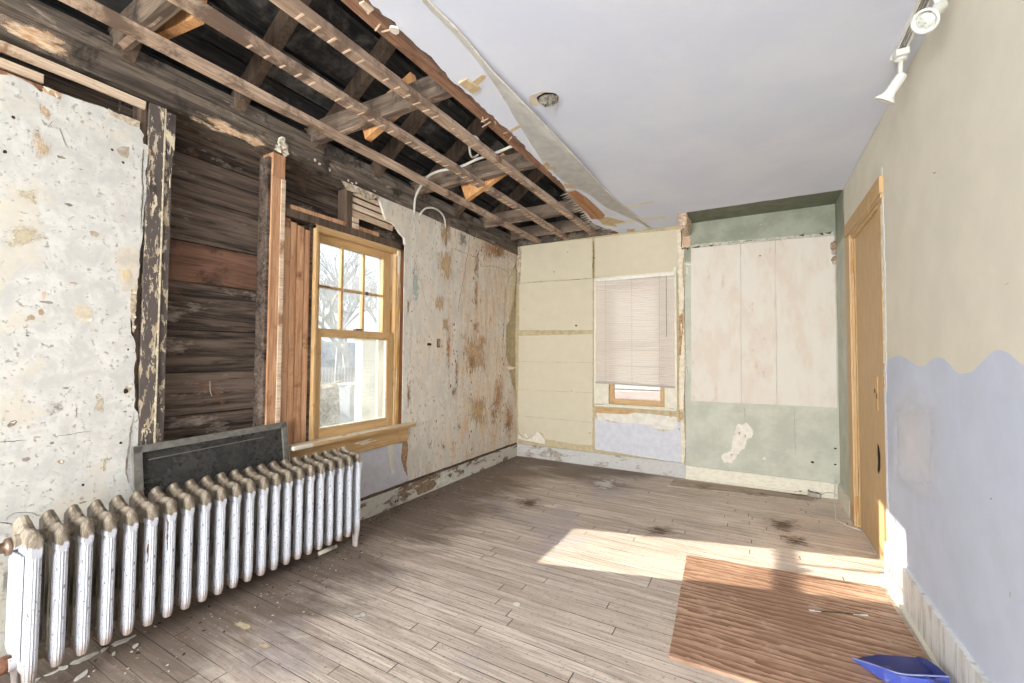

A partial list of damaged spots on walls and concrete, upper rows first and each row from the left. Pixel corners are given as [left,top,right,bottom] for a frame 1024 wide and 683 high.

flaking render [388,441,408,476]
peeling [721,423,753,463]
peeling [437,470,456,487]